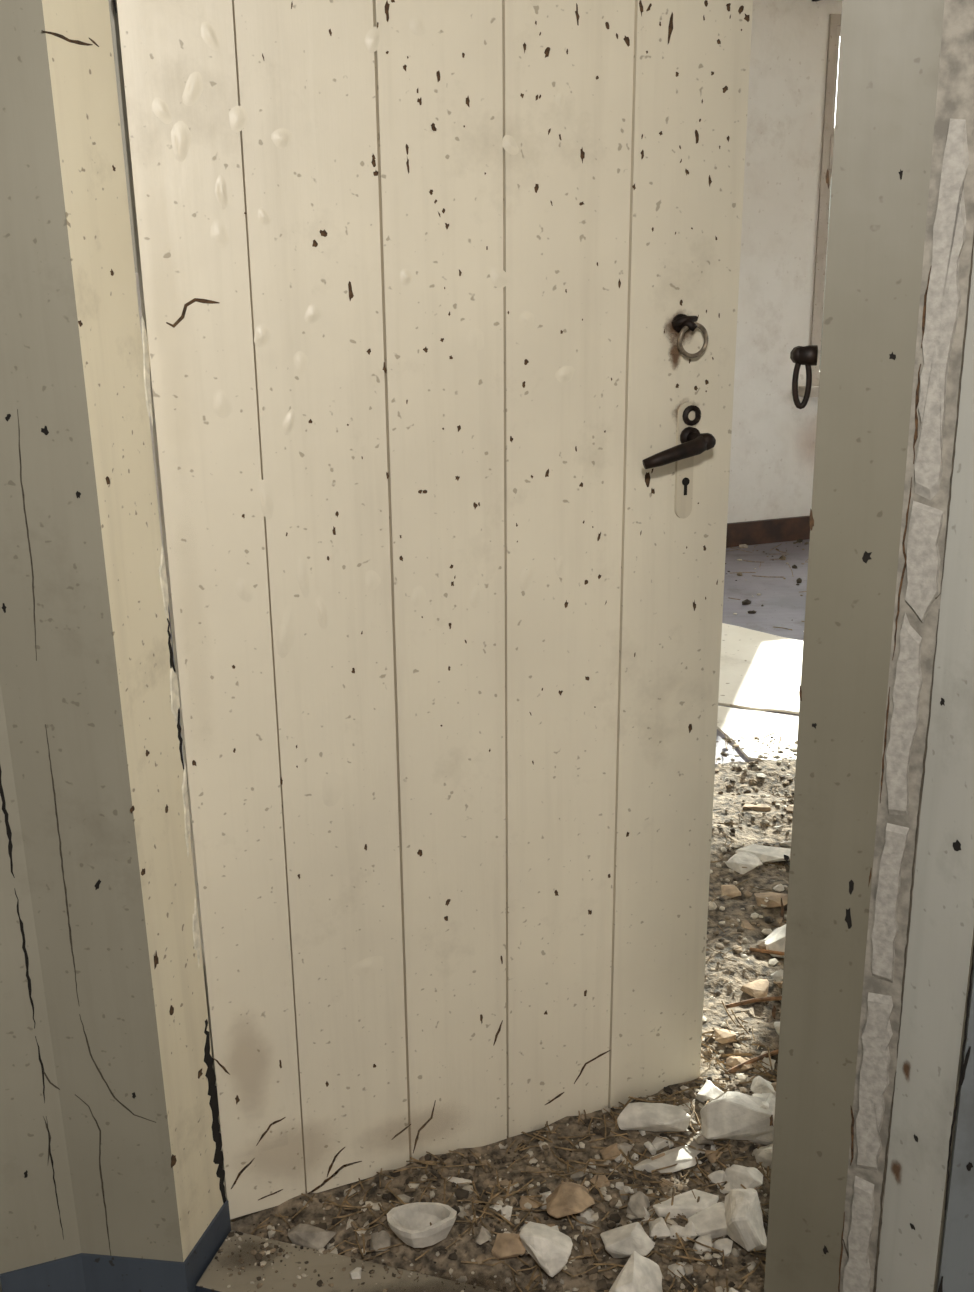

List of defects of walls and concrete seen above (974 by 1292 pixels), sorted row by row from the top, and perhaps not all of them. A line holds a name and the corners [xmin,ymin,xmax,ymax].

crack [17,409,37,661]
crack [167,618,176,673]
crack [176,709,184,770]
crack [0,724,156,1256]
crack [204,1019,226,1203]